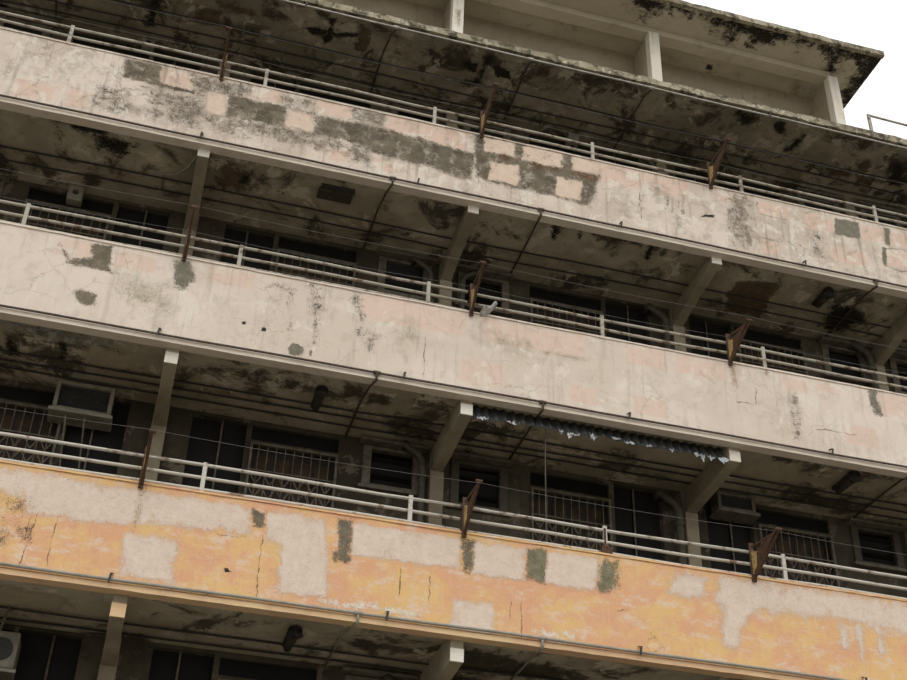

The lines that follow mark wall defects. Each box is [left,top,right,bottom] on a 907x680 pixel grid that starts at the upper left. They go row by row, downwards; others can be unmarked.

leakage [626,0,881,109]
leakage [578,74,609,87]
leakage [736,109,757,127]
leakage [772,121,807,155]
leakage [725,194,756,251]
leakage [59,243,197,317]
leakage [332,518,356,564]
leakage [525,547,549,585]
leakage [592,557,622,594]
peeling [712,574,907,663]